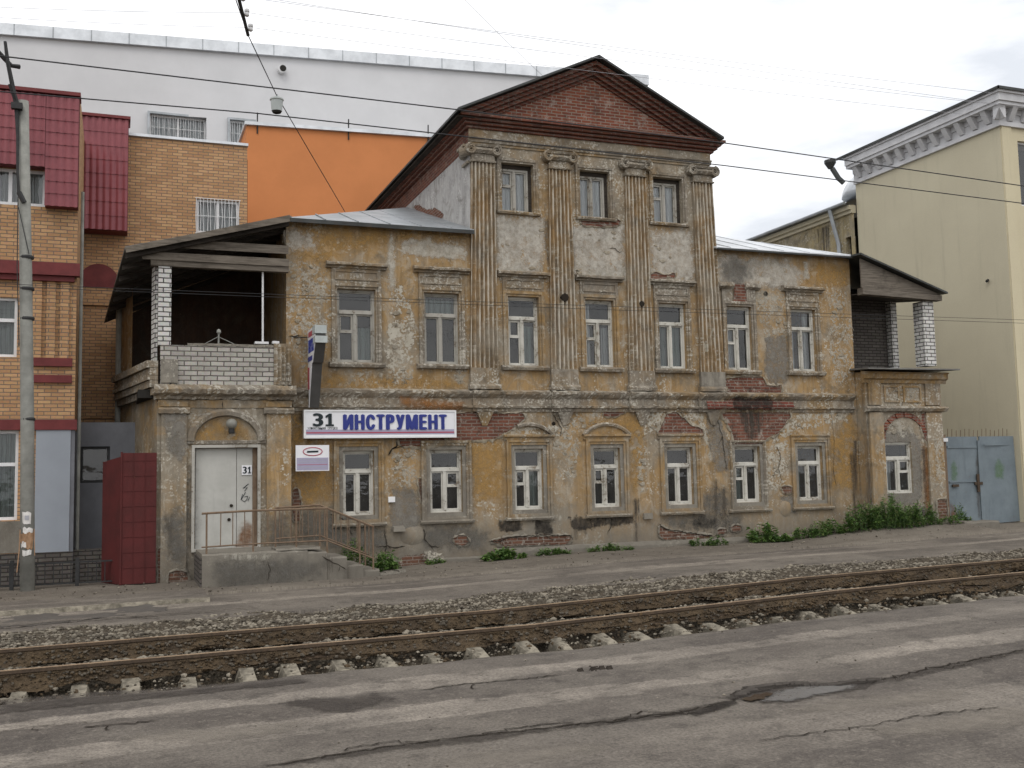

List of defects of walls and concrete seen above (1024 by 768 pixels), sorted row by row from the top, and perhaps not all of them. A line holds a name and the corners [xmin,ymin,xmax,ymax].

flaking render [650,230,695,280]
flaking render [391,411,626,504]
flaking render [637,374,850,495]
spalling [888,412,949,519]
spalling [489,533,573,548]
spalling [658,523,743,541]